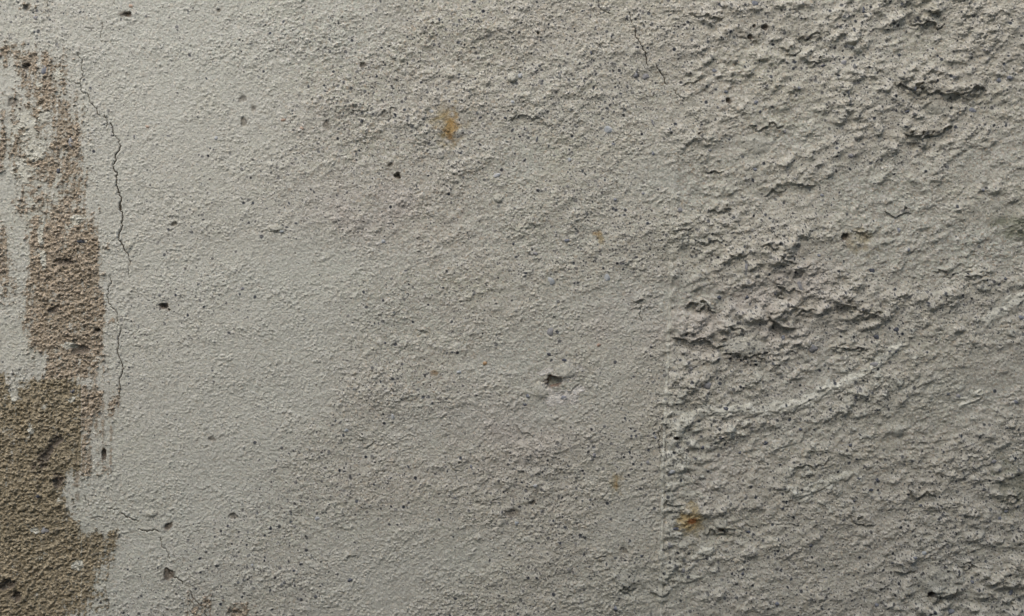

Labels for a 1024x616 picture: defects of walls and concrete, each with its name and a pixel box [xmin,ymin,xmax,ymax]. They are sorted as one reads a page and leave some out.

peeling [0,40,120,616]
crack [65,56,131,396]